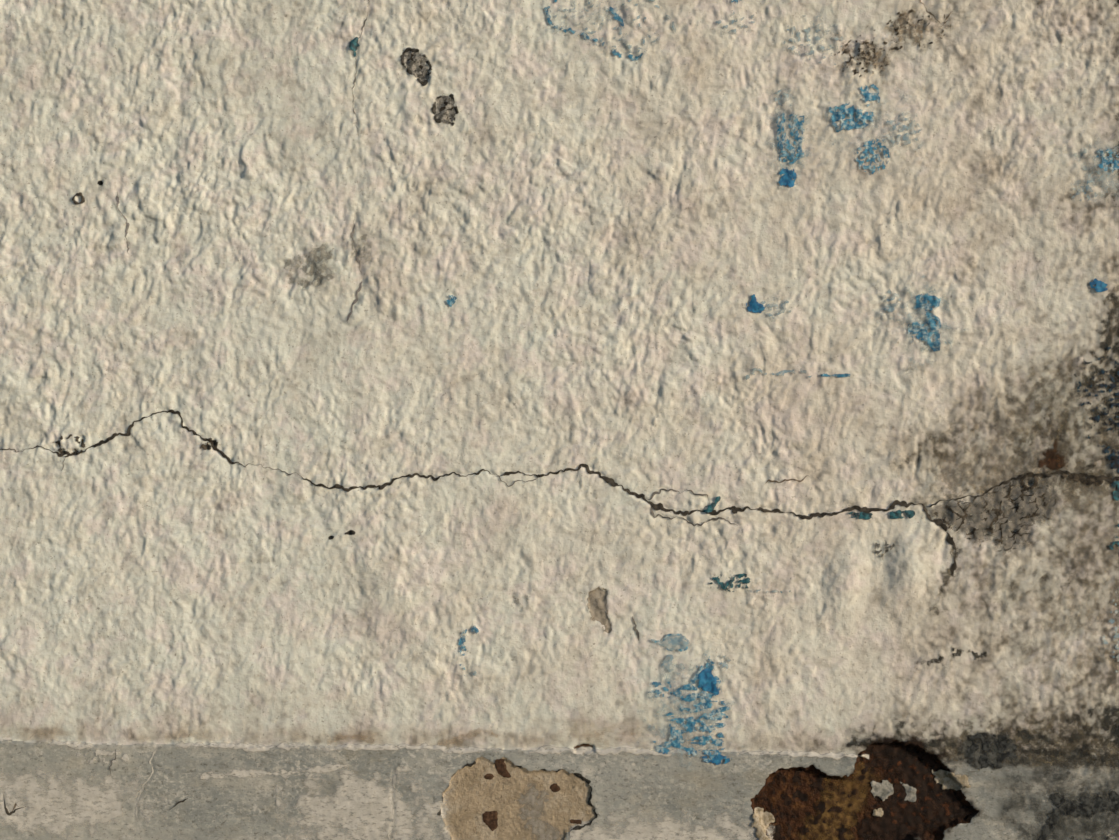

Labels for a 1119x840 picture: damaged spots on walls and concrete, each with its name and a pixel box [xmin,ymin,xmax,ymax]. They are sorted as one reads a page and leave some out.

spalling [400,47,432,86]
spalling [431,94,458,126]
peeling [774,89,805,165]
peeling [829,9,951,174]
peeling [908,293,942,351]
water stain [1081,286,1119,450]
crack [0,410,1119,576]
spalling [587,587,612,633]
peeling [651,634,689,651]
peeling [653,656,732,765]
spalling [437,756,598,840]